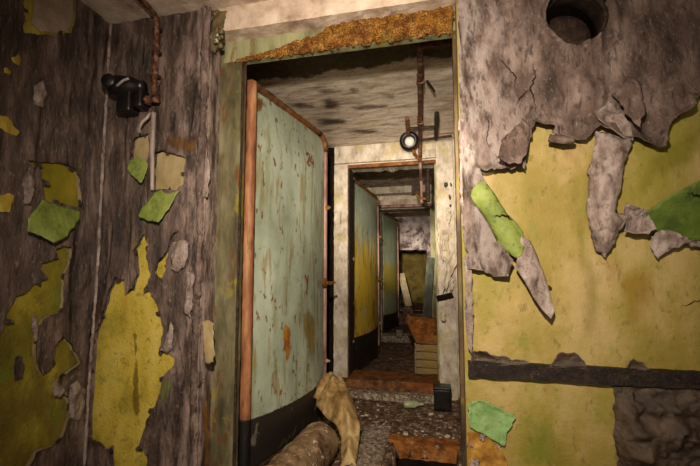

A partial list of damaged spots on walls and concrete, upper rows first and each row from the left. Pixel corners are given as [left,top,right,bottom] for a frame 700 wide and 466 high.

corrosion [235,6,455,62]
crack [501,60,537,112]
peeling [0,193,14,212]
peeling [0,116,19,136]
peeling [22,161,83,207]
peeling [131,134,149,162]
peeling [154,151,186,190]
peeling [196,150,211,197]
damp [318,119,345,131]
peeling [436,0,700,366]
peeling [0,236,195,466]
peeling [202,320,215,364]